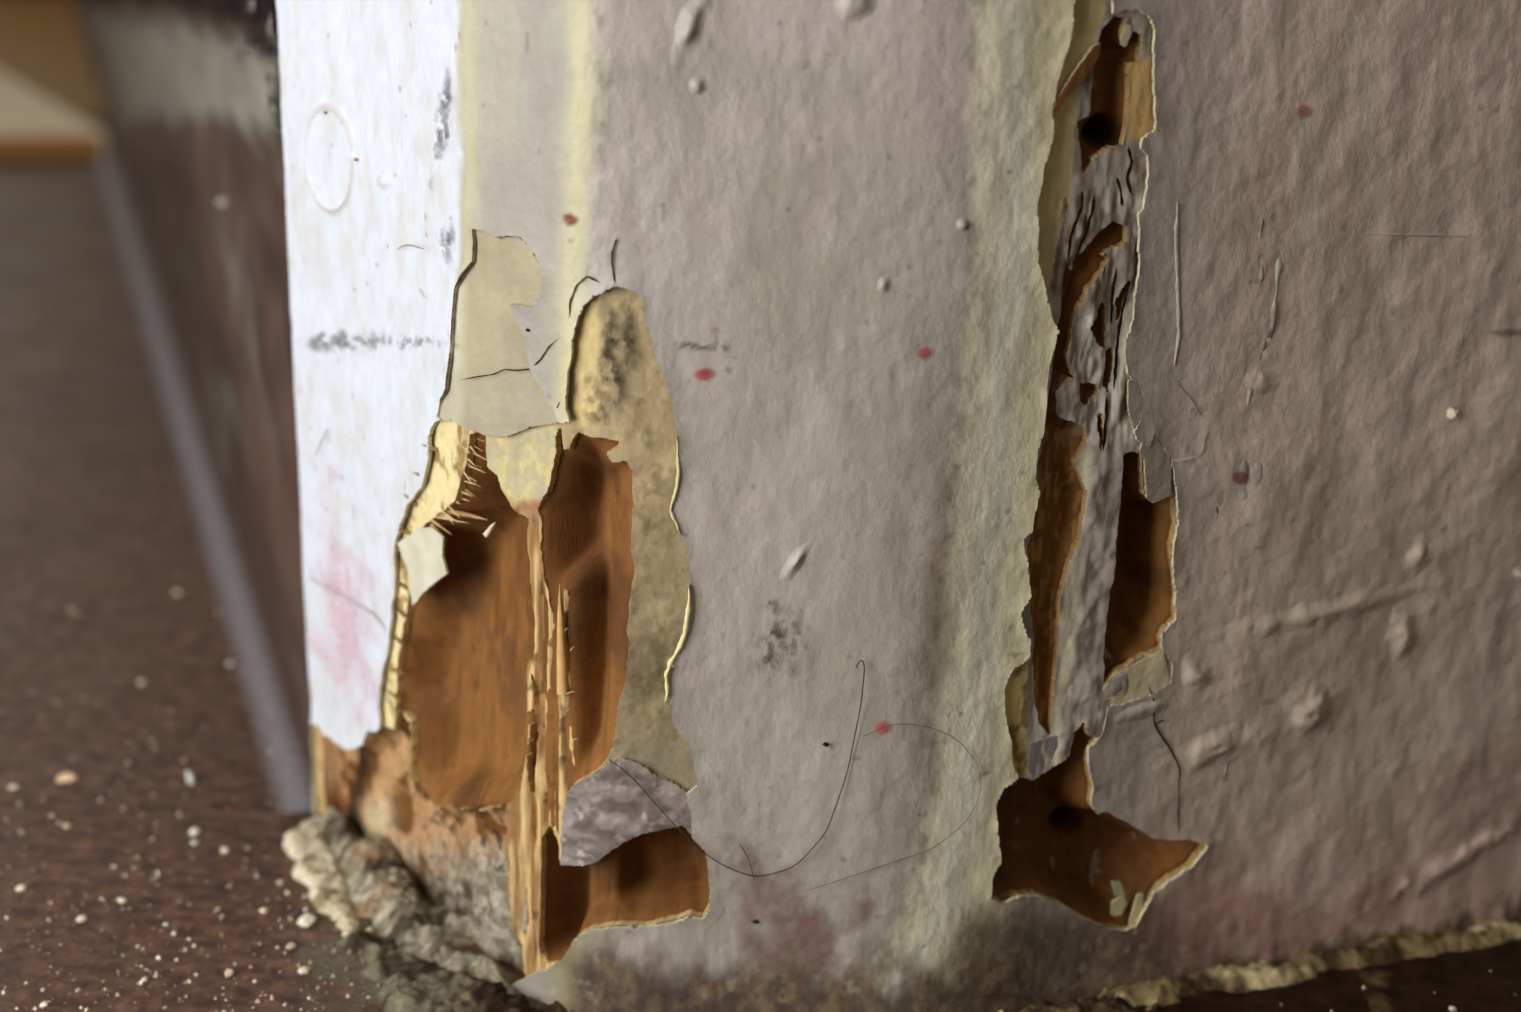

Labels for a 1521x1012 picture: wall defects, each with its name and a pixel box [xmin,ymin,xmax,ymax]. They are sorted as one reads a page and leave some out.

spalling [314,724,326,816]
spalling [362,229,710,968]
peeling [991,0,1206,935]
peeling [1259,255,1282,360]